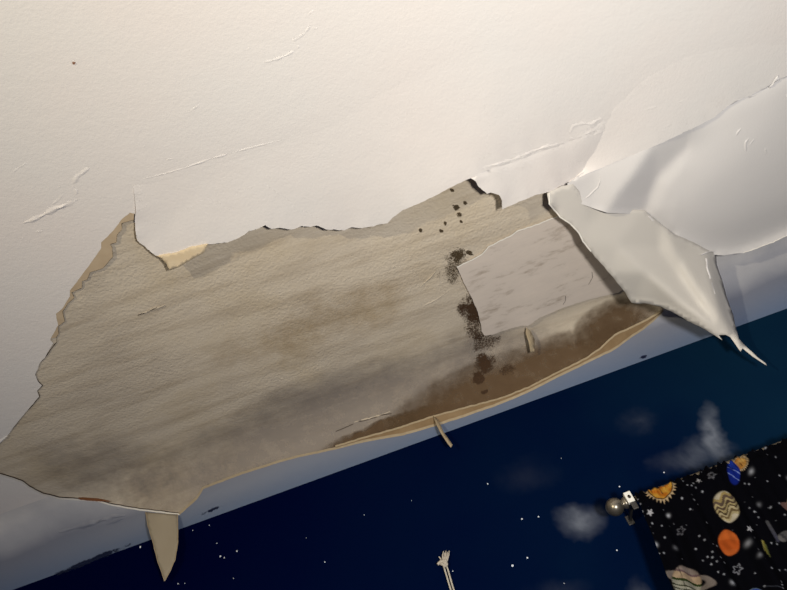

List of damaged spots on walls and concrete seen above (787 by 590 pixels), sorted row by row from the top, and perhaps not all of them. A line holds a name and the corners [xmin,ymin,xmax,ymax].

flaking render [0,178,664,515]
damp [190,294,649,490]